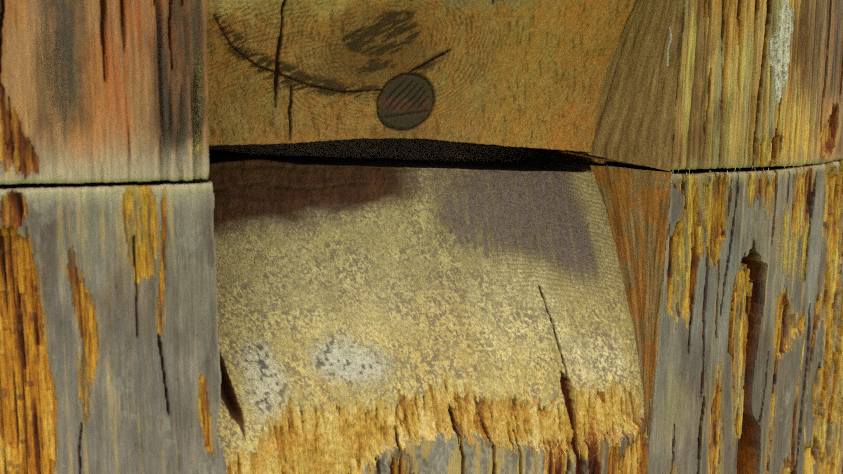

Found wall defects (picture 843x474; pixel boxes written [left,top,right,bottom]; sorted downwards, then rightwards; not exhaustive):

crack [703,0,760,133]
crack [771,170,790,246]
crack [537,284,586,474]
crack [688,172,739,474]
spalling [736,239,768,474]
crack [758,351,770,423]
crack [375,425,415,474]
crack [448,403,466,474]
crack [479,416,497,474]
crack [511,429,523,474]
crack [669,423,677,474]